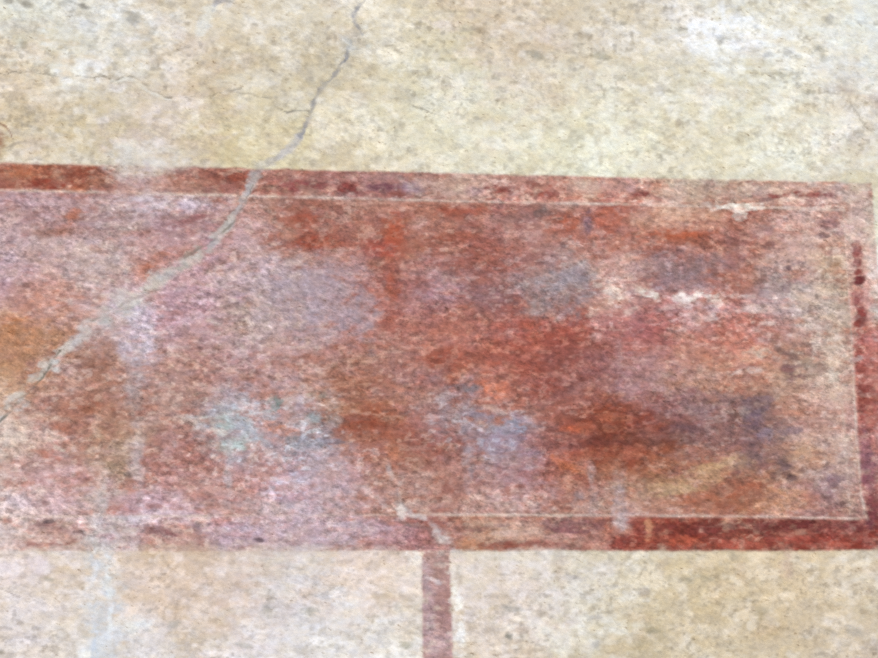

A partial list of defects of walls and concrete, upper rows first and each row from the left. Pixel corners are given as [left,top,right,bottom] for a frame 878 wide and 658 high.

crack [0,0,376,431]